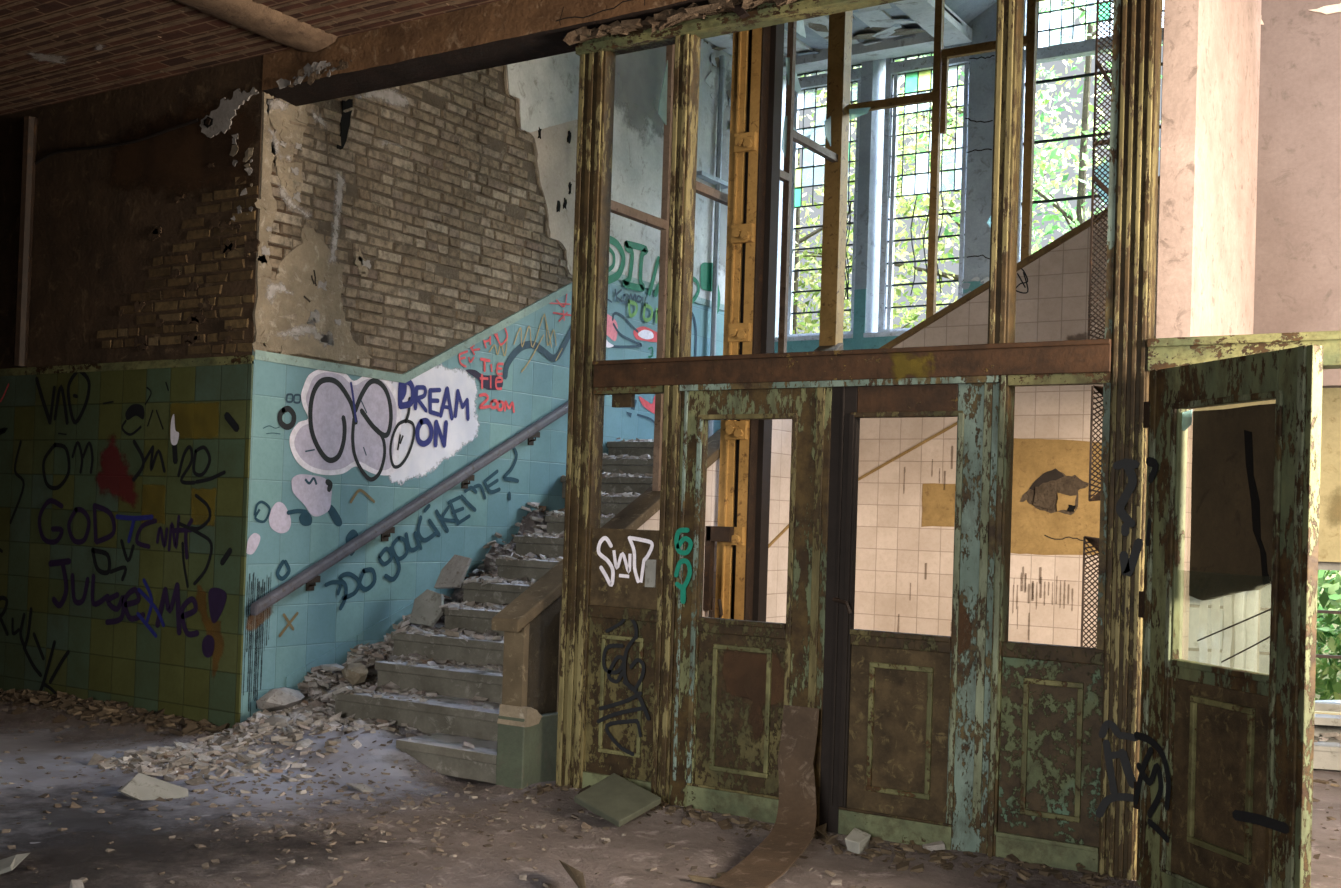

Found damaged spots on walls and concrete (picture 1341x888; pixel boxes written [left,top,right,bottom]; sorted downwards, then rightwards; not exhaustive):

peeling [783,23,829,61]
peeling [852,3,925,46]
spalling [97,0,797,372]
rust [722,650,784,741]